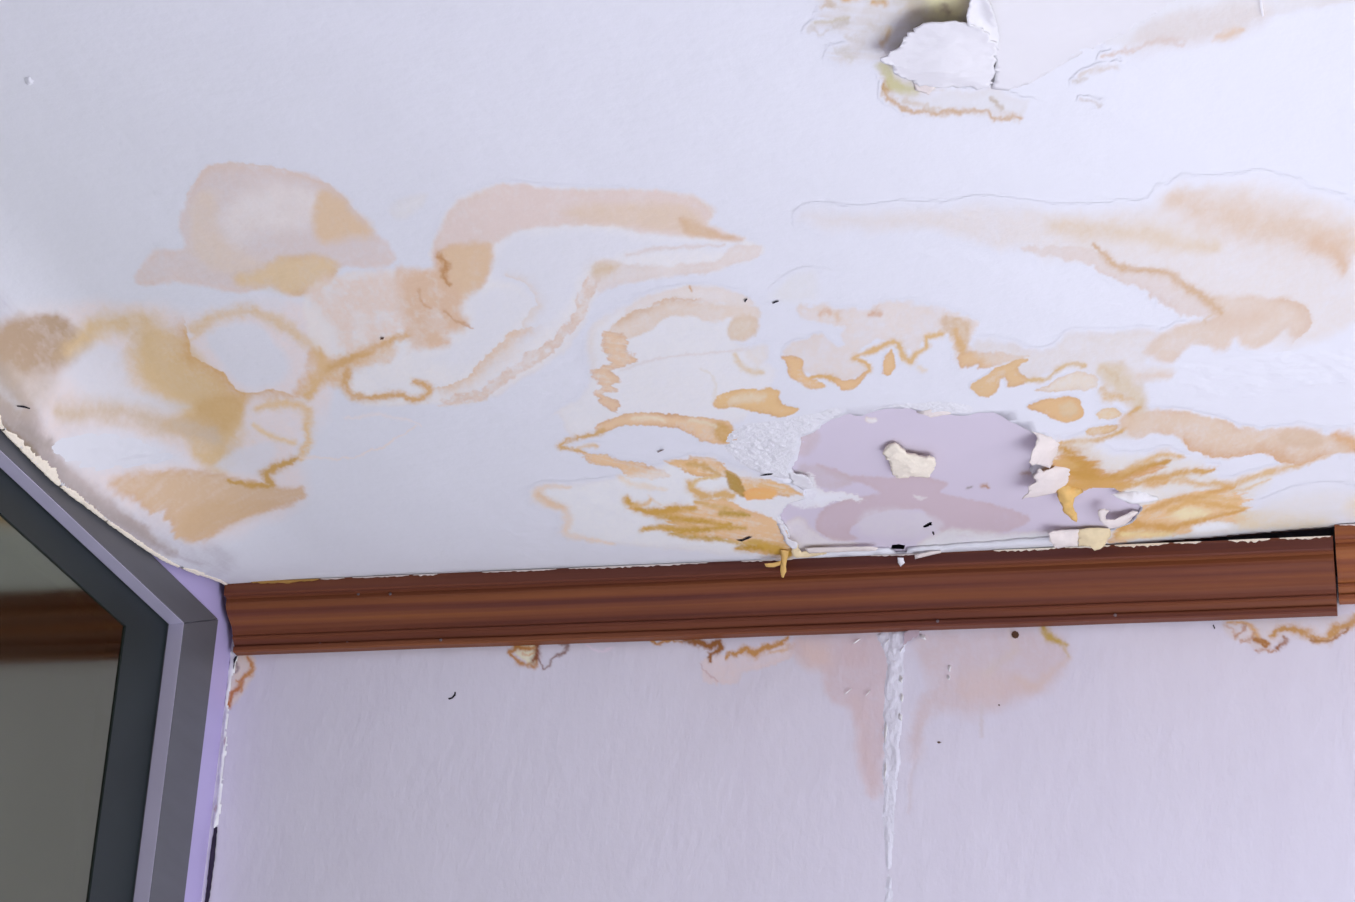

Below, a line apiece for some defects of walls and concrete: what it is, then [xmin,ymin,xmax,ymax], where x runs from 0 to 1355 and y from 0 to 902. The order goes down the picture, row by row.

damp [801,0,1034,126]
peeling [880,0,1175,95]
damp [1069,0,1355,111]
damp [0,159,1355,580]
peeling [765,408,1159,578]
damp [648,626,1083,817]
damp [1218,609,1355,803]